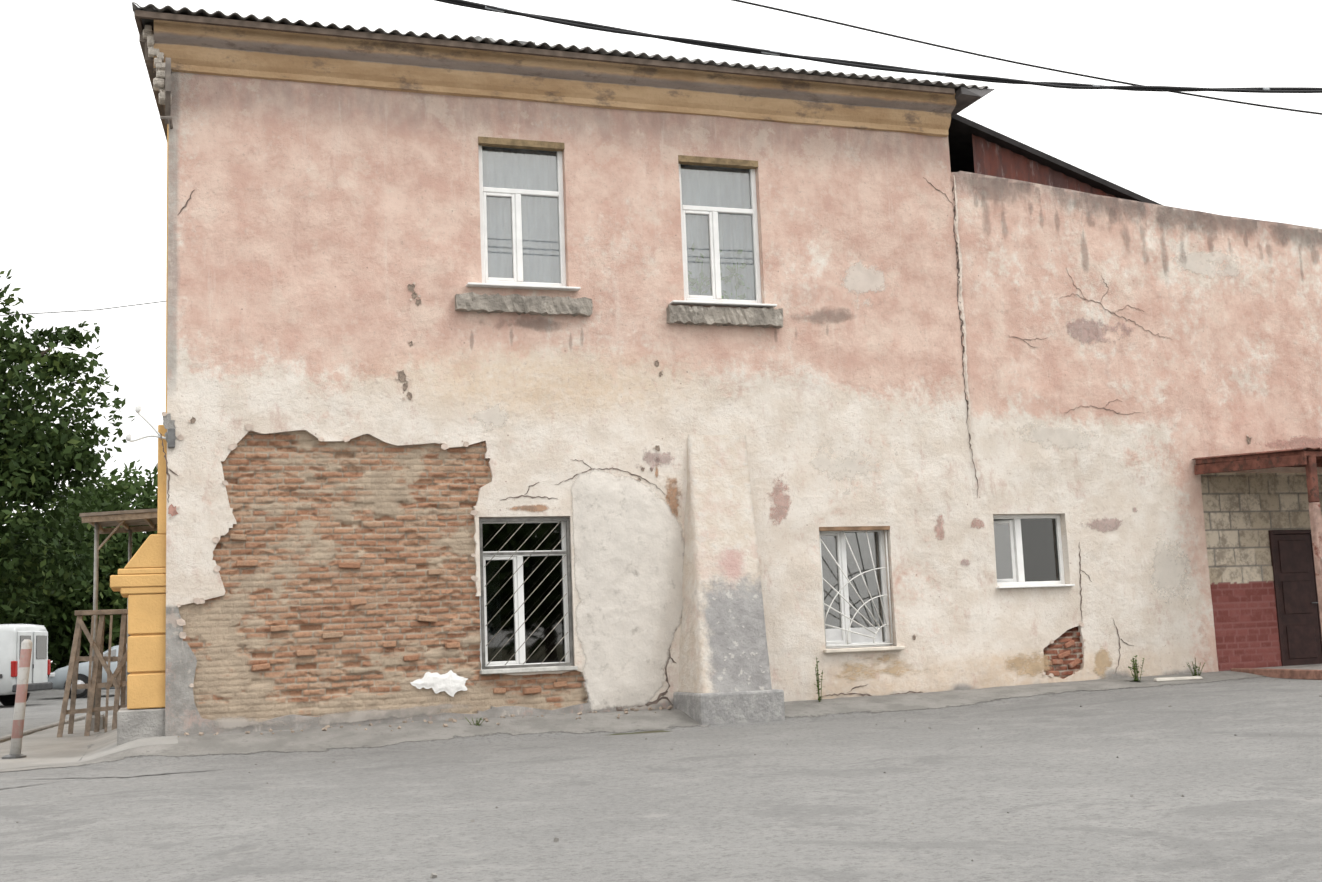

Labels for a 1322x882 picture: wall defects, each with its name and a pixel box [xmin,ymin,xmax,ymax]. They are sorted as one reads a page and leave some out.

crack [923,175,978,495]
crack [1059,271,1165,338]
crack [1066,399,1140,415]
crack [502,459,667,500]
spalling [176,424,588,722]
spalling [1043,622,1086,679]